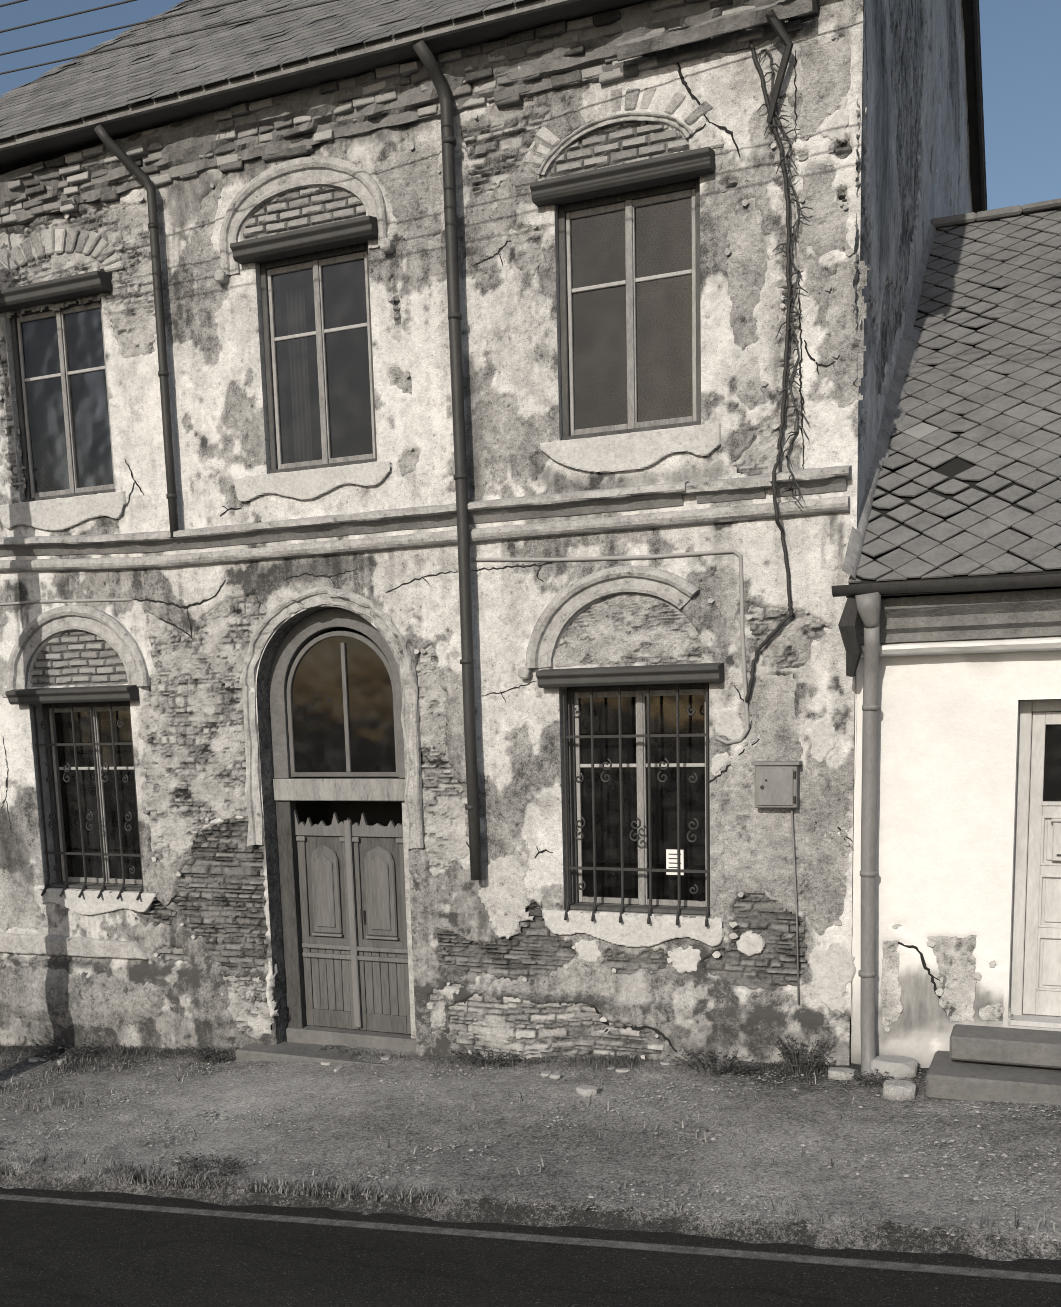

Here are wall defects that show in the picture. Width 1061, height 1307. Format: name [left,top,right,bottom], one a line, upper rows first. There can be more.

crack [677,63,741,158]
spalling [0,196,156,494]
crack [134,581,225,638]
spalling [132,593,274,1039]
flaking render [700,568,854,990]
spalling [426,900,674,1060]
flaking render [879,925,903,1032]
crack [898,942,941,999]
flaking render [927,935,1013,1026]